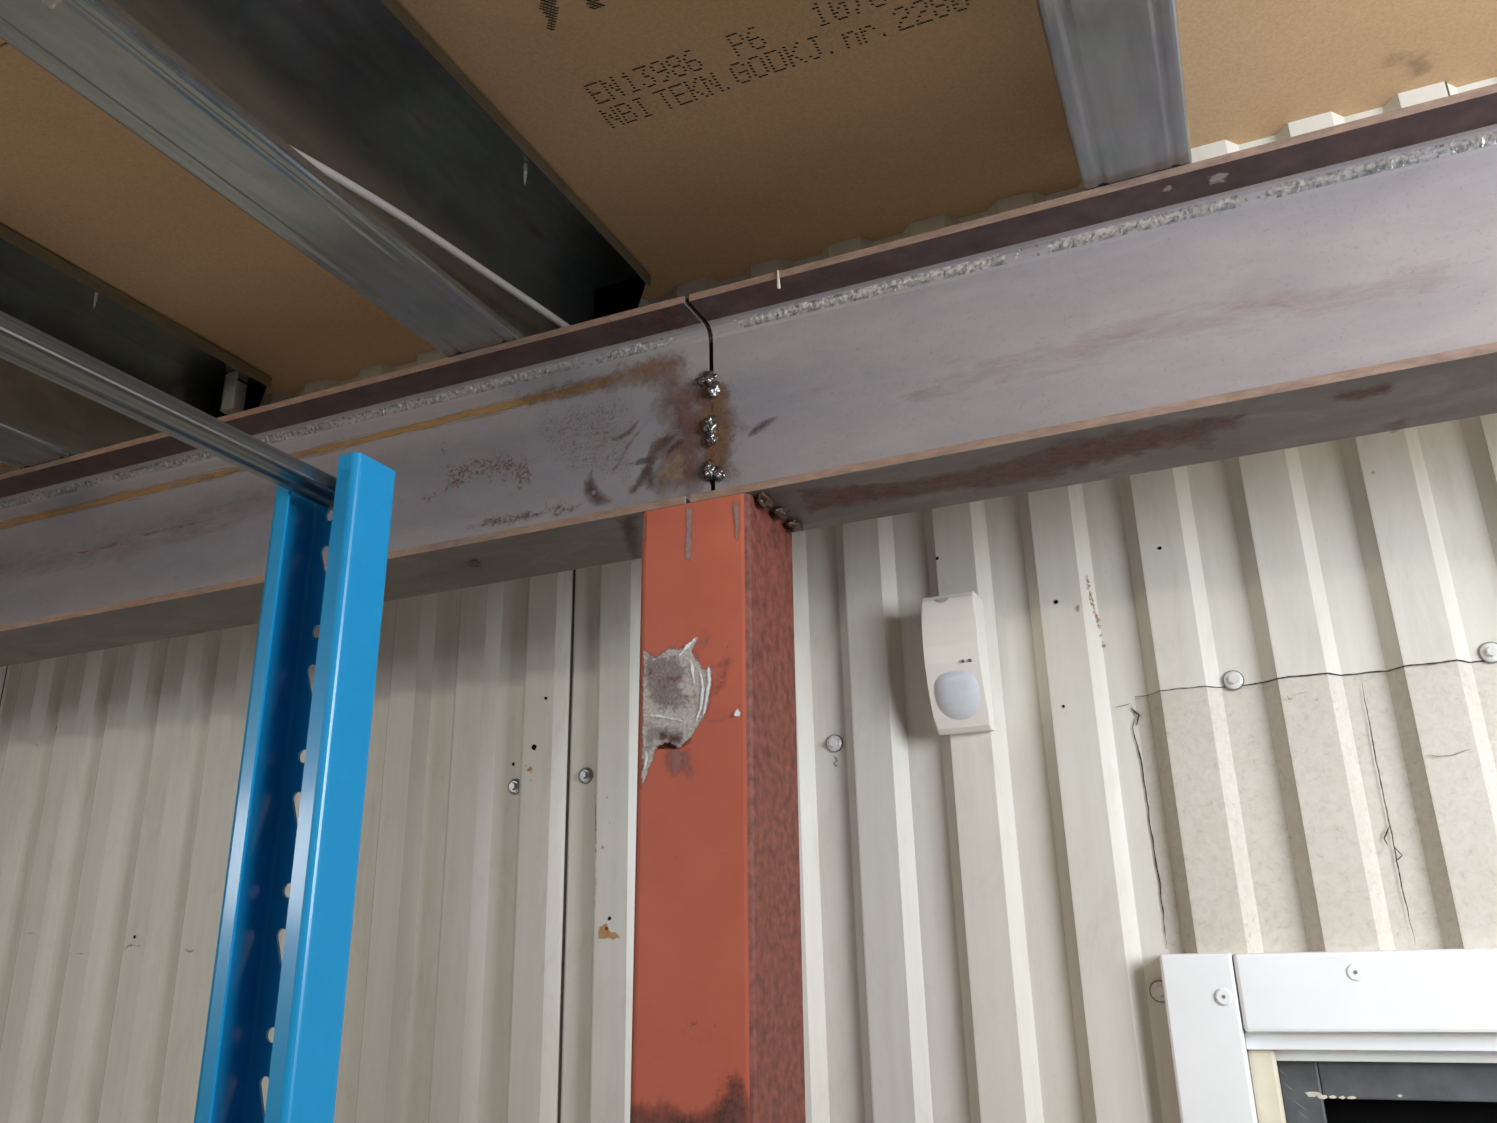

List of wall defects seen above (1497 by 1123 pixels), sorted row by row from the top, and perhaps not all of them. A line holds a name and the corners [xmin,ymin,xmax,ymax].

rust [290,360,730,487]
rust [0,467,243,529]
peeling [641,638,740,784]
crack [1118,659,1484,945]
rust [599,924,619,939]